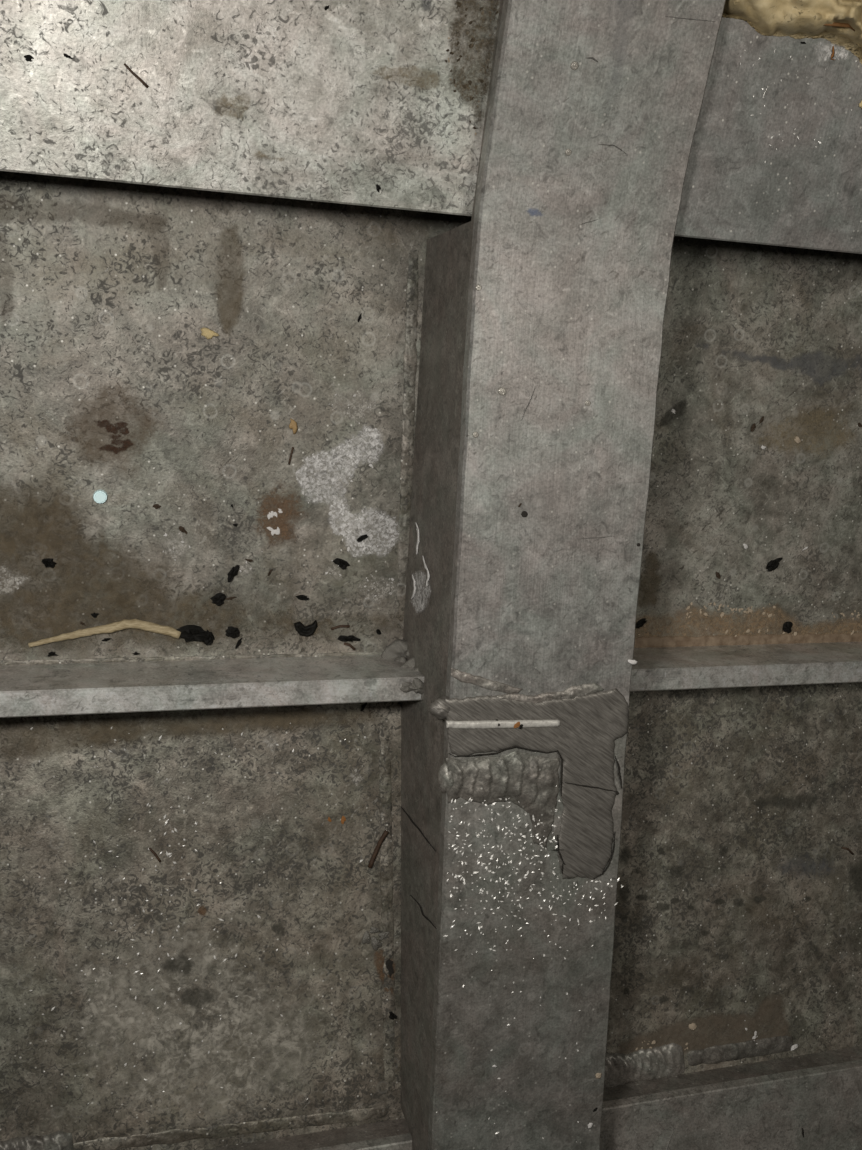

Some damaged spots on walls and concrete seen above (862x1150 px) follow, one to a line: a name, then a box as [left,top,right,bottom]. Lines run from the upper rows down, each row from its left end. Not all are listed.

corrosion [79,412,151,456]
corrosion [257,393,399,557]
leakage [0,496,245,648]
corrosion [410,523,431,611]